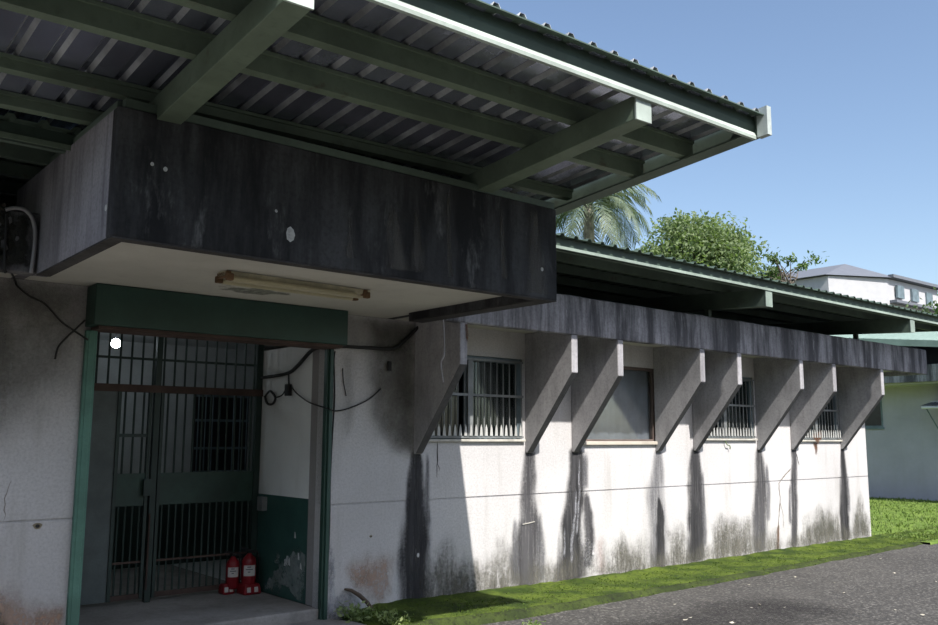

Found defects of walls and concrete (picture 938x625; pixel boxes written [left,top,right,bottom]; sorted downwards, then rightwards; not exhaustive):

leakage [376,330,594,599]
leakage [609,449,868,572]